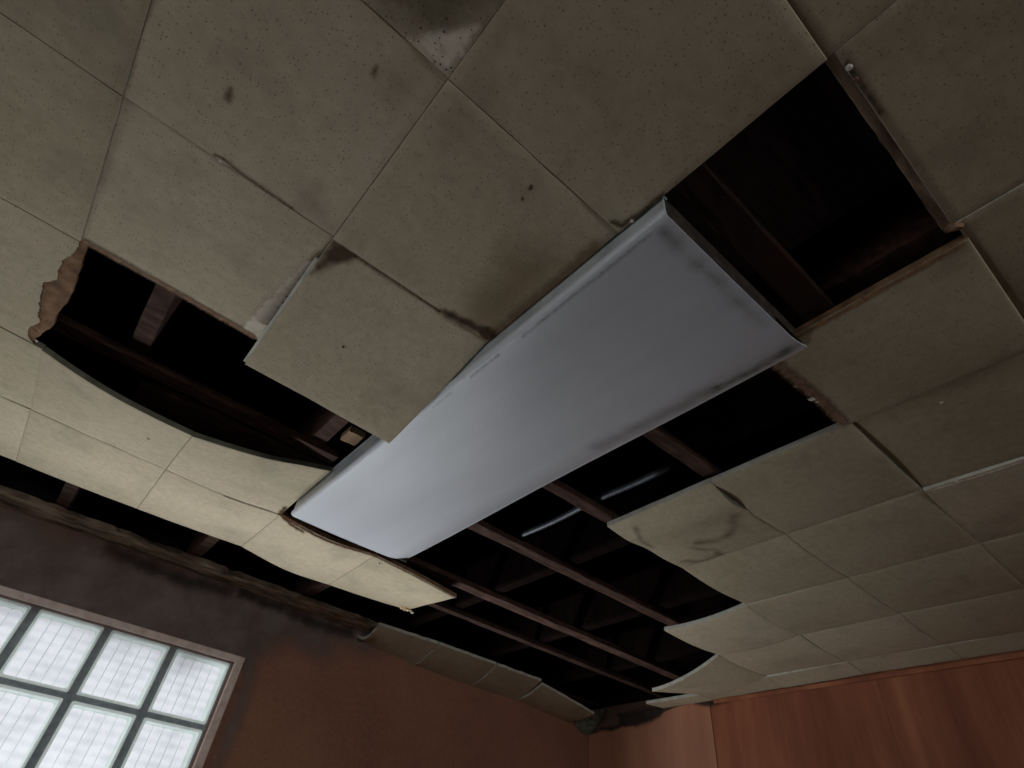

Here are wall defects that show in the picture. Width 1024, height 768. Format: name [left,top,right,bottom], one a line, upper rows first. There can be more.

spalling [29,240,312,342]
water stain [316,242,492,335]
spalling [772,362,848,425]